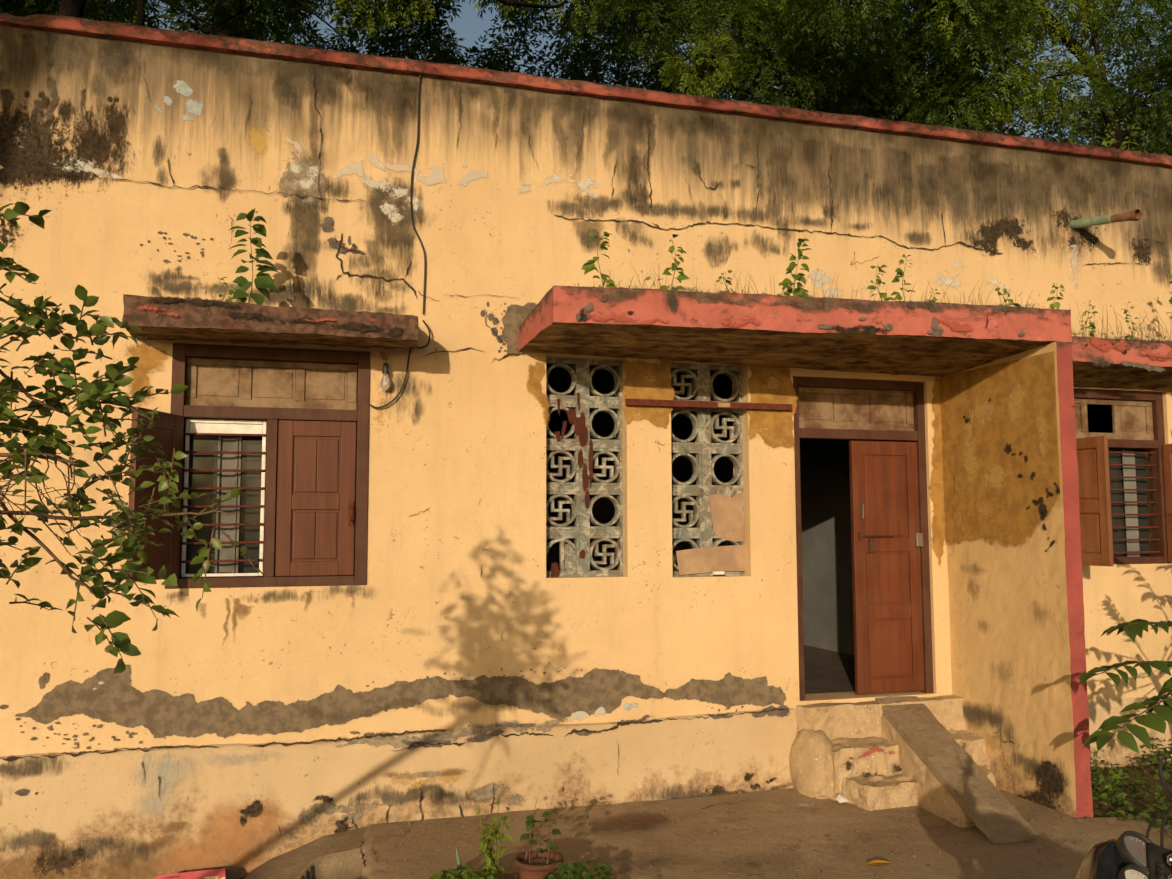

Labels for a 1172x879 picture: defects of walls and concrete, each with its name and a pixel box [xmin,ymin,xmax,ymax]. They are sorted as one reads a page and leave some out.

leakage [0,25,145,202]
crack [42,72,365,248]
peeling [289,161,320,203]
leakage [555,96,792,252]
leakage [801,141,1172,288]
crack [335,233,526,361]
spalling [480,302,508,353]
peeling [1026,482,1060,552]
crack [0,729,464,762]
peeling [0,665,790,750]
crack [501,708,789,776]
leakage [962,704,1072,812]